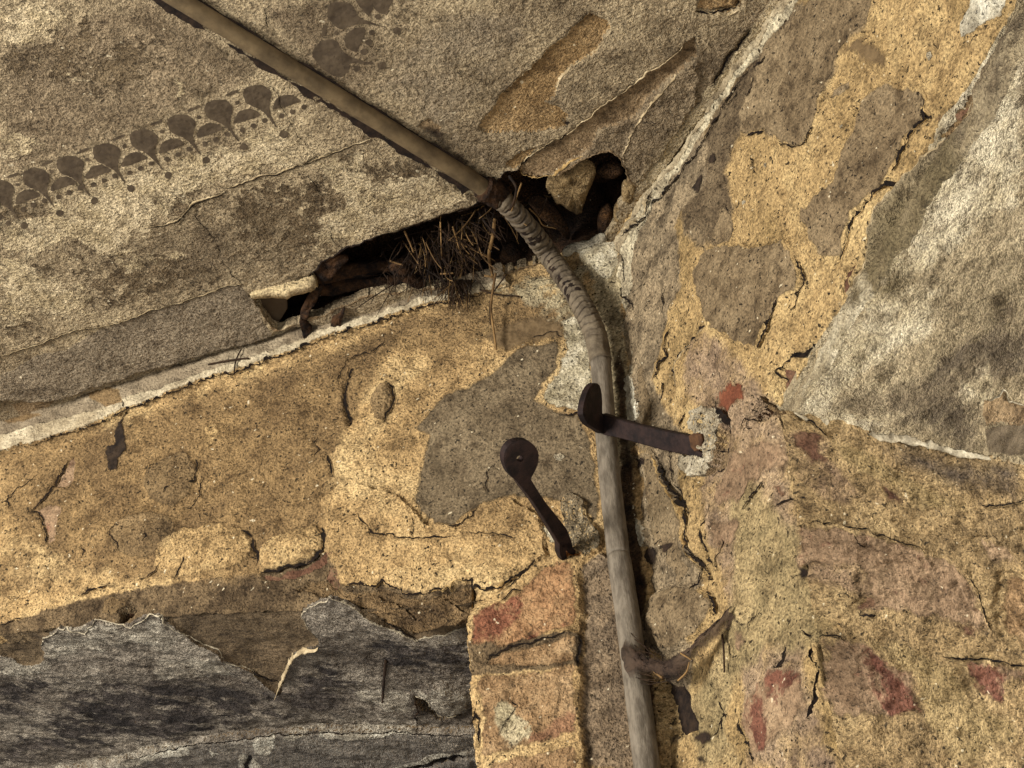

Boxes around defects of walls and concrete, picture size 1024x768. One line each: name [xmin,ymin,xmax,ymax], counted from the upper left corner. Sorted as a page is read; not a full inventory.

crack [835,94,932,265]
hole [298,201,502,280]
flaking render [692,206,797,346]
crack [756,256,805,349]
spalling [756,396,808,422]
crack [774,344,816,384]
peeling [866,431,991,460]
crack [6,463,67,544]
crack [240,528,326,573]
flaking render [630,443,688,583]
crack [648,415,724,614]
peeling [0,482,545,768]